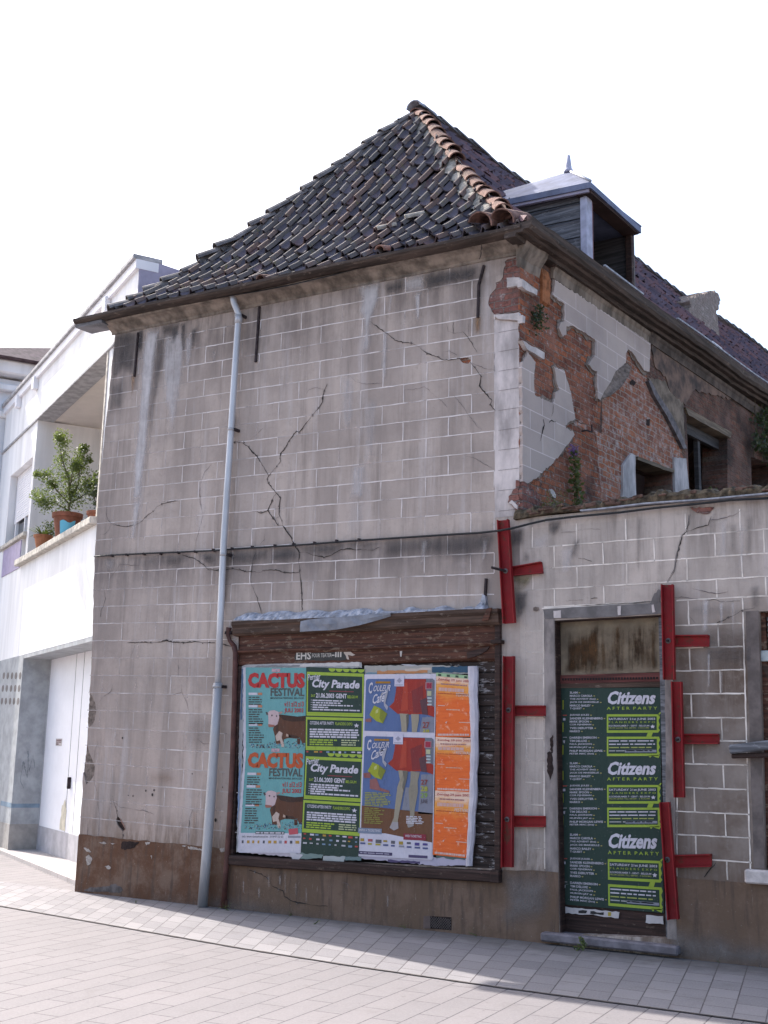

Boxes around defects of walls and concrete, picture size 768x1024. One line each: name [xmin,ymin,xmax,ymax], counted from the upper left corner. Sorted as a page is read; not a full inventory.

water stain [115,325,195,524]
crack [372,323,495,423]
flaking render [488,258,683,510]
crack [183,385,379,610]
crack [667,510,747,623]
crack [129,639,231,713]
flaking render [84,817,152,865]